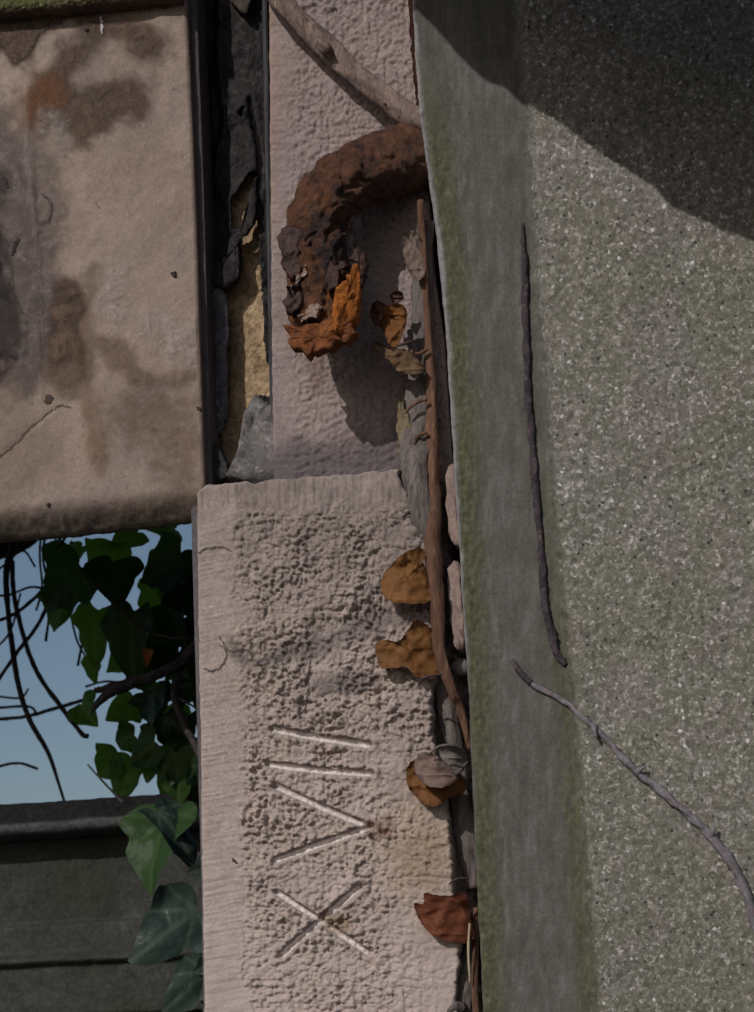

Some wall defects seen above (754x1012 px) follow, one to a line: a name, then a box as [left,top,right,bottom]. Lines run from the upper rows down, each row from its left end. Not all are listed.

crack [0,404,71,458]
damp [0,16,163,395]
peeling [206,0,369,464]
rust [282,318,361,362]